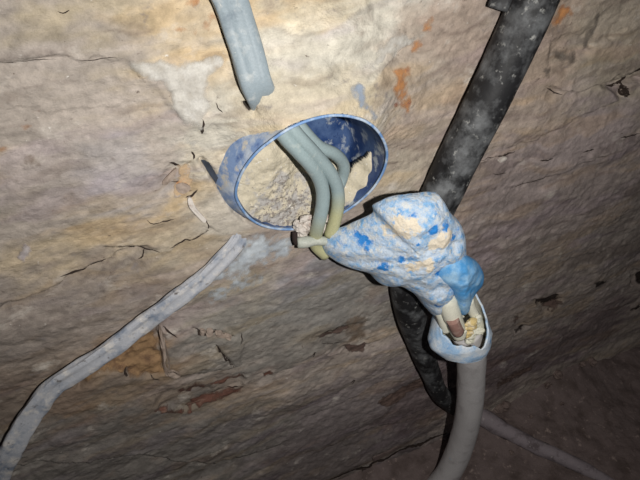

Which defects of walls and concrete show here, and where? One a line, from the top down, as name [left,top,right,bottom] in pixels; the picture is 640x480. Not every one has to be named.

rust [394,69,411,111]
crack [606,68,640,97]
flaking render [162,162,206,223]
crack [61,220,209,277]
flaking render [535,294,561,311]
flaking render [85,325,180,380]
flaking render [320,317,366,352]
flaking render [156,374,244,414]